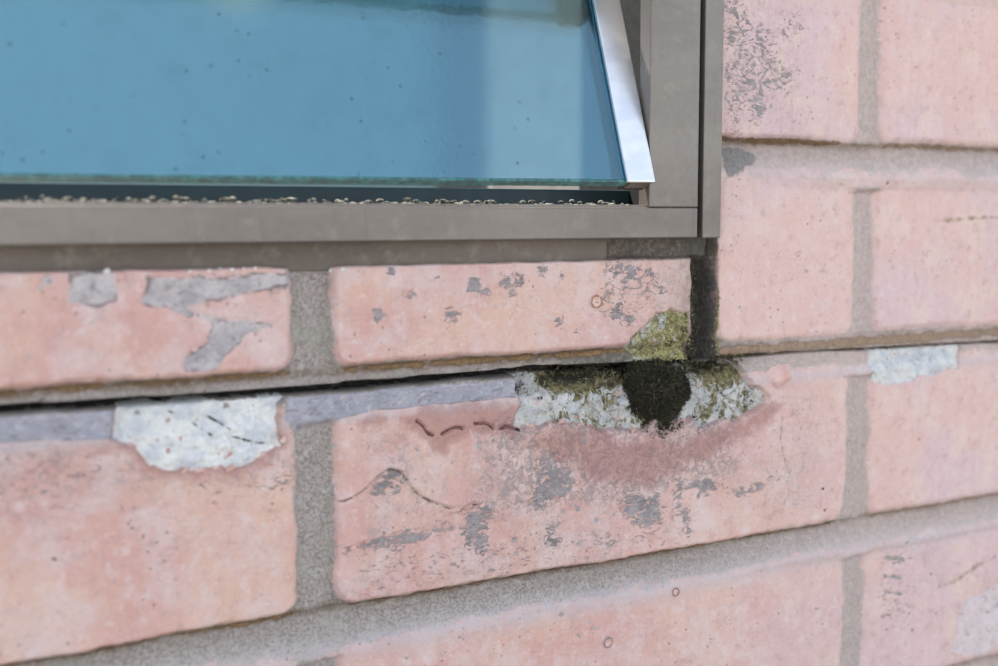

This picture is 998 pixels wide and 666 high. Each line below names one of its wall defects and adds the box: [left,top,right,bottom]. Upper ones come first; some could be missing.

peeling [65,268,125,309]
peeling [138,267,293,373]
crack [0,365,542,412]
flaking render [0,364,646,502]
flaking render [666,357,764,434]
flaking render [863,344,958,385]